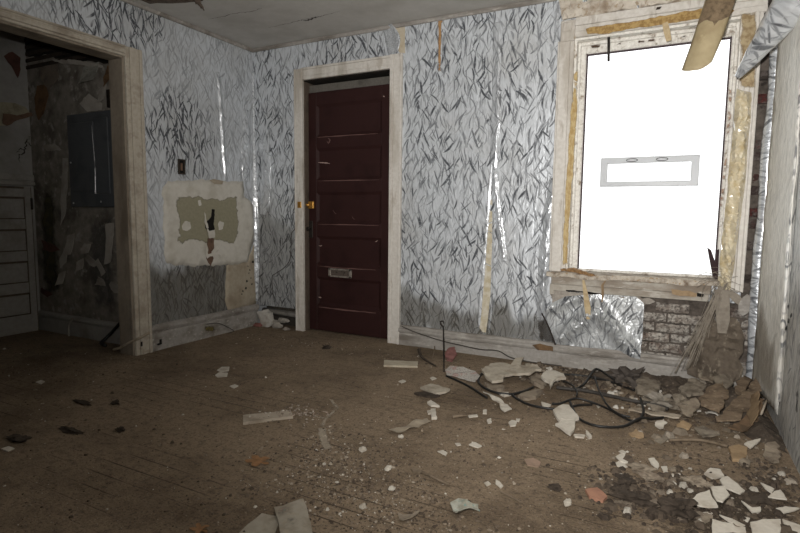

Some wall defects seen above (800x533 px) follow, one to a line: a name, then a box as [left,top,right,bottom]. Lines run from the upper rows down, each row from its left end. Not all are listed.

peeling [682,0,735,71]
peeling [79,84,107,112]
spalling [205,209,215,231]
flaking render [730,53,769,365]
peeling [55,223,118,293]
flaking render [637,297,716,358]